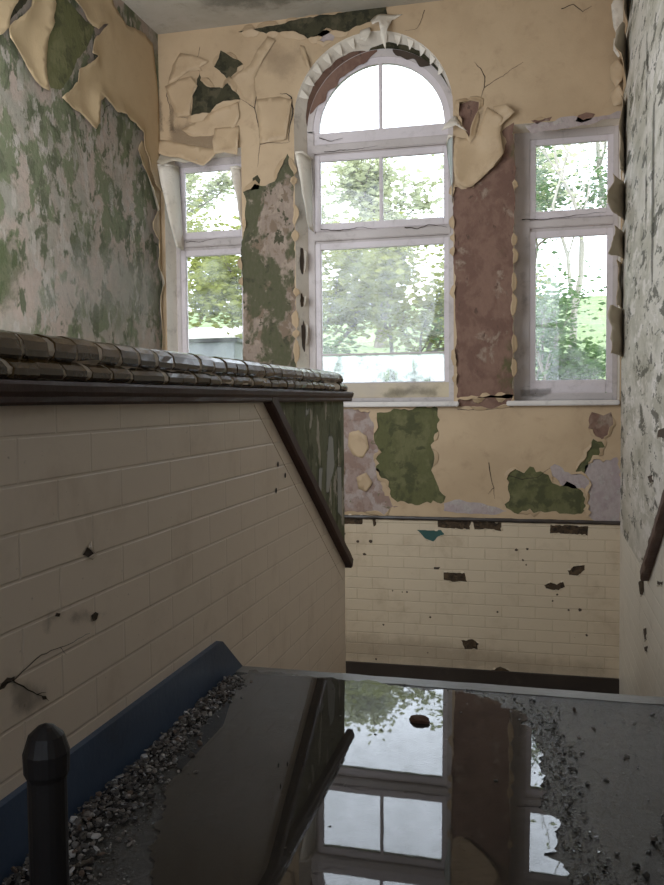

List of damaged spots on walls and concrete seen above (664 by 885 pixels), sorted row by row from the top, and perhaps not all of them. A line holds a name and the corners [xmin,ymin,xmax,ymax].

water stain [0,235,20,305]
peeling [0,0,448,367]
peeling [442,96,519,410]
peeling [526,0,628,360]
peeling [279,401,621,541]
spalling [434,567,468,583]
spalling [544,564,585,602]